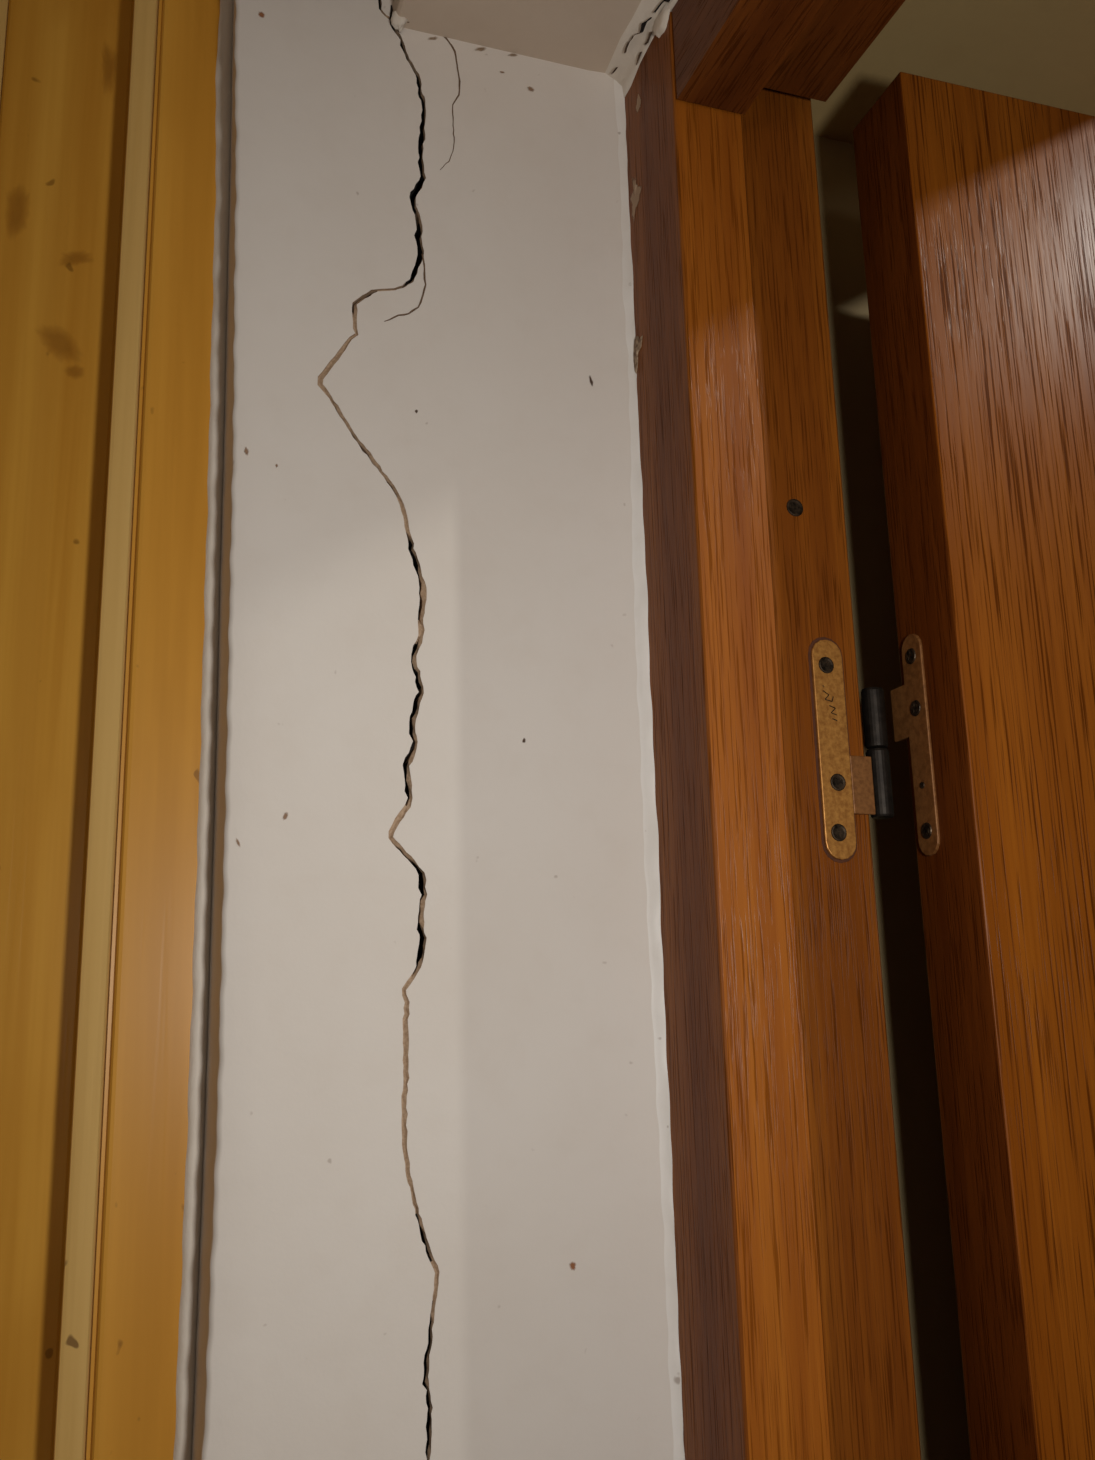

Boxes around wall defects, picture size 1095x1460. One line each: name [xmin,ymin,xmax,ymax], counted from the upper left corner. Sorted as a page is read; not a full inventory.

crack [317,0,461,1460]